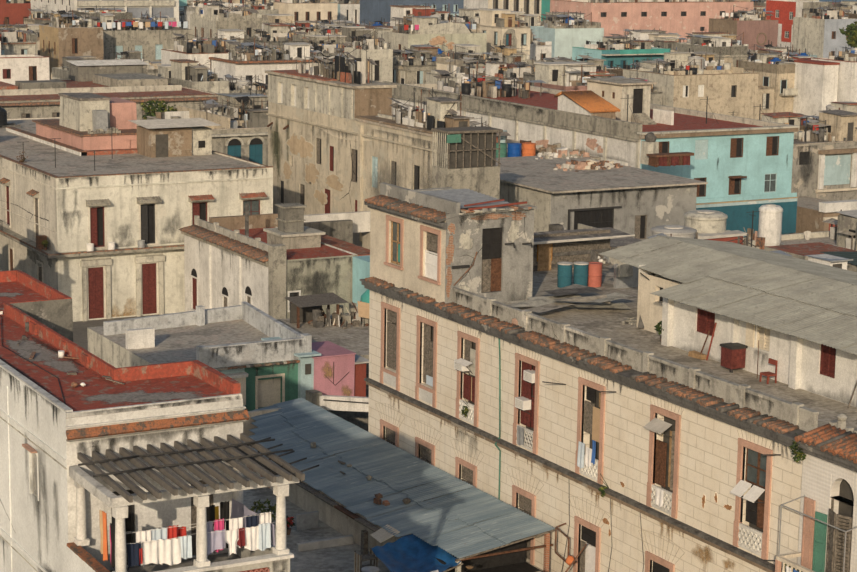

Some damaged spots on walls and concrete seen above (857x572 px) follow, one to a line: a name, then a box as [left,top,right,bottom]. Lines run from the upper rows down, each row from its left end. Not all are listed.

flaking render [445,223,474,301]
damp [695,547,711,563]